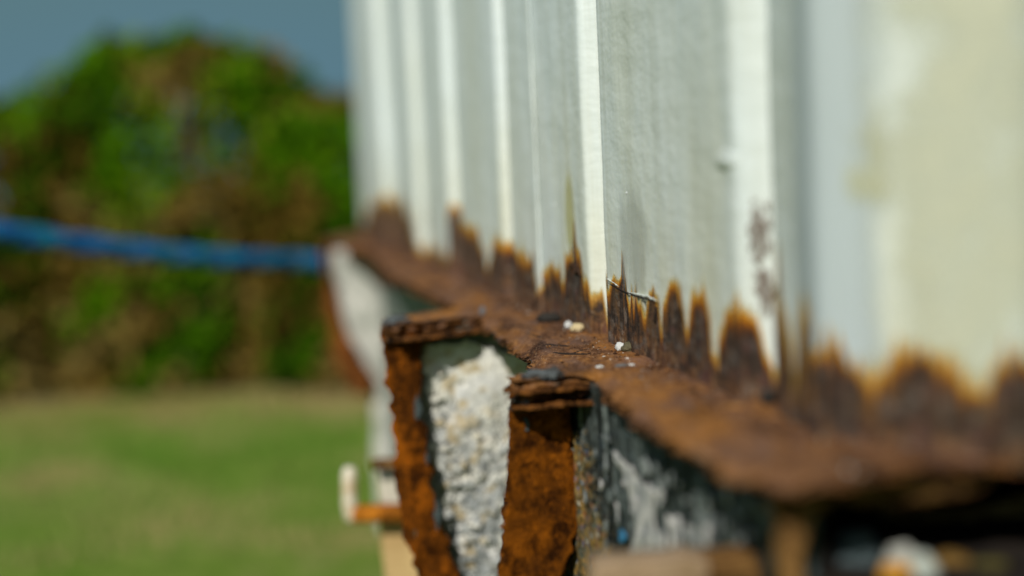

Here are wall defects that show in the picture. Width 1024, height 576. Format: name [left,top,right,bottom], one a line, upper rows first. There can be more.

rust [361,186,1024,465]
peeling [414,339,528,576]
peeling [593,434,756,551]